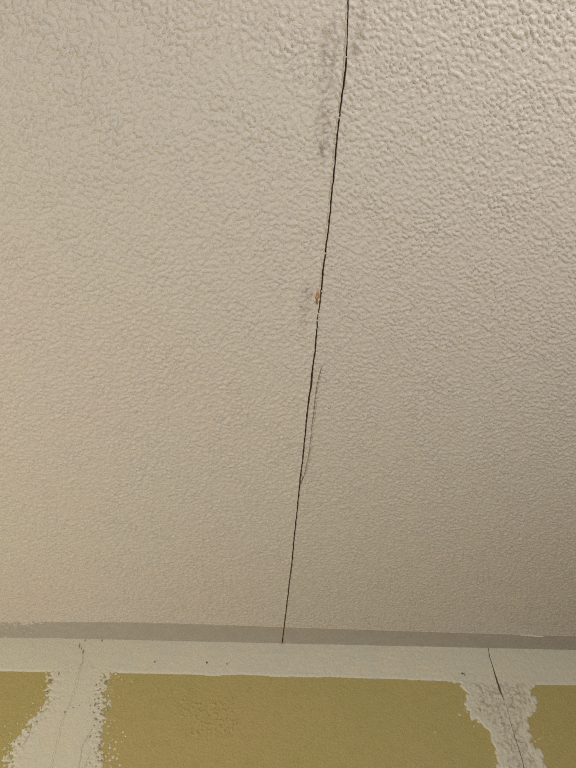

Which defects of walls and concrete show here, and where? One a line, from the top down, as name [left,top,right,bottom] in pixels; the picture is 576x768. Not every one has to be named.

crack [282,0,349,643]
crack [488,649,510,717]